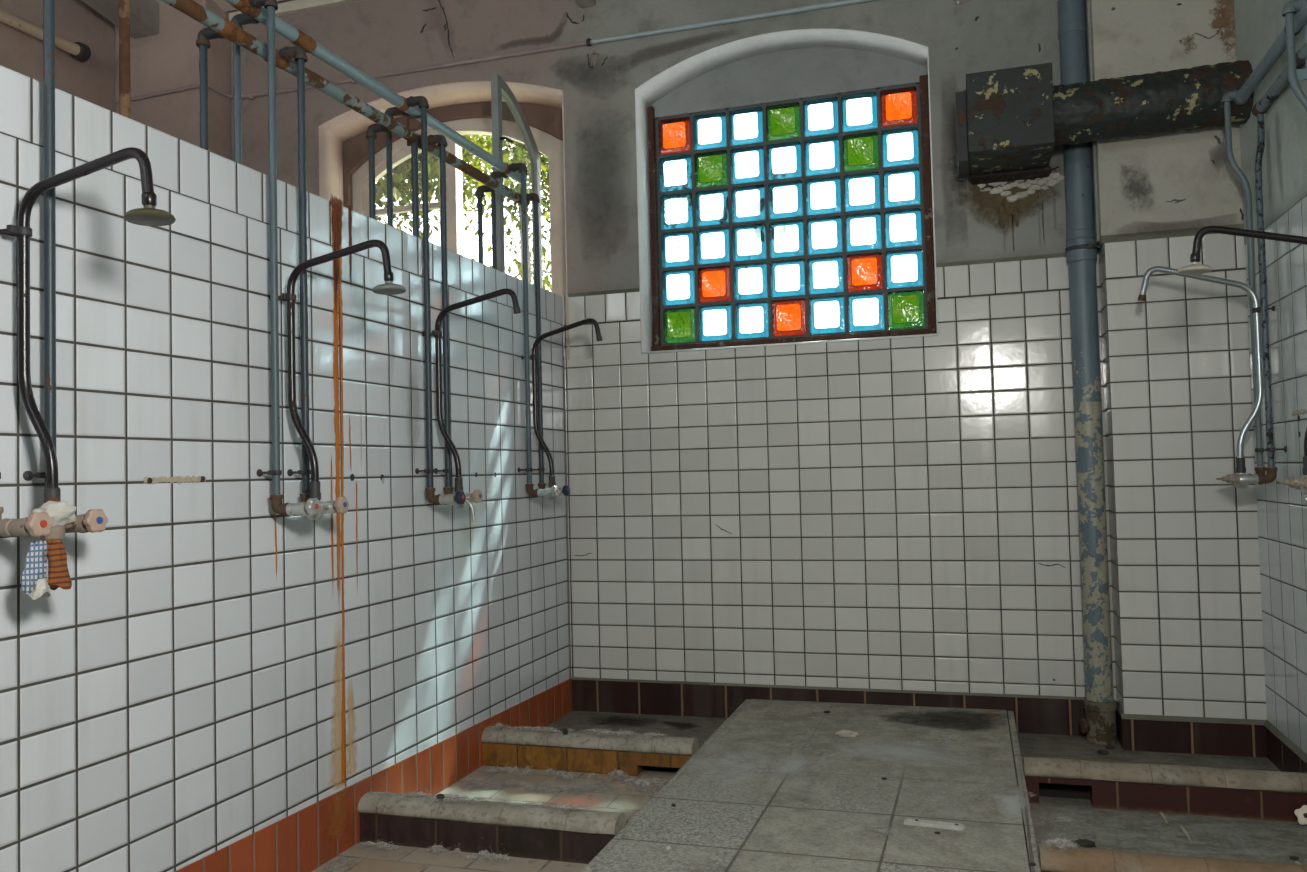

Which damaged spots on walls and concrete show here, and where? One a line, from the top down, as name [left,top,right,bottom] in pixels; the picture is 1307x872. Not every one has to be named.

crack [420,0,454,59]
damp [965,178,1055,251]
corrosion [328,195,358,838]